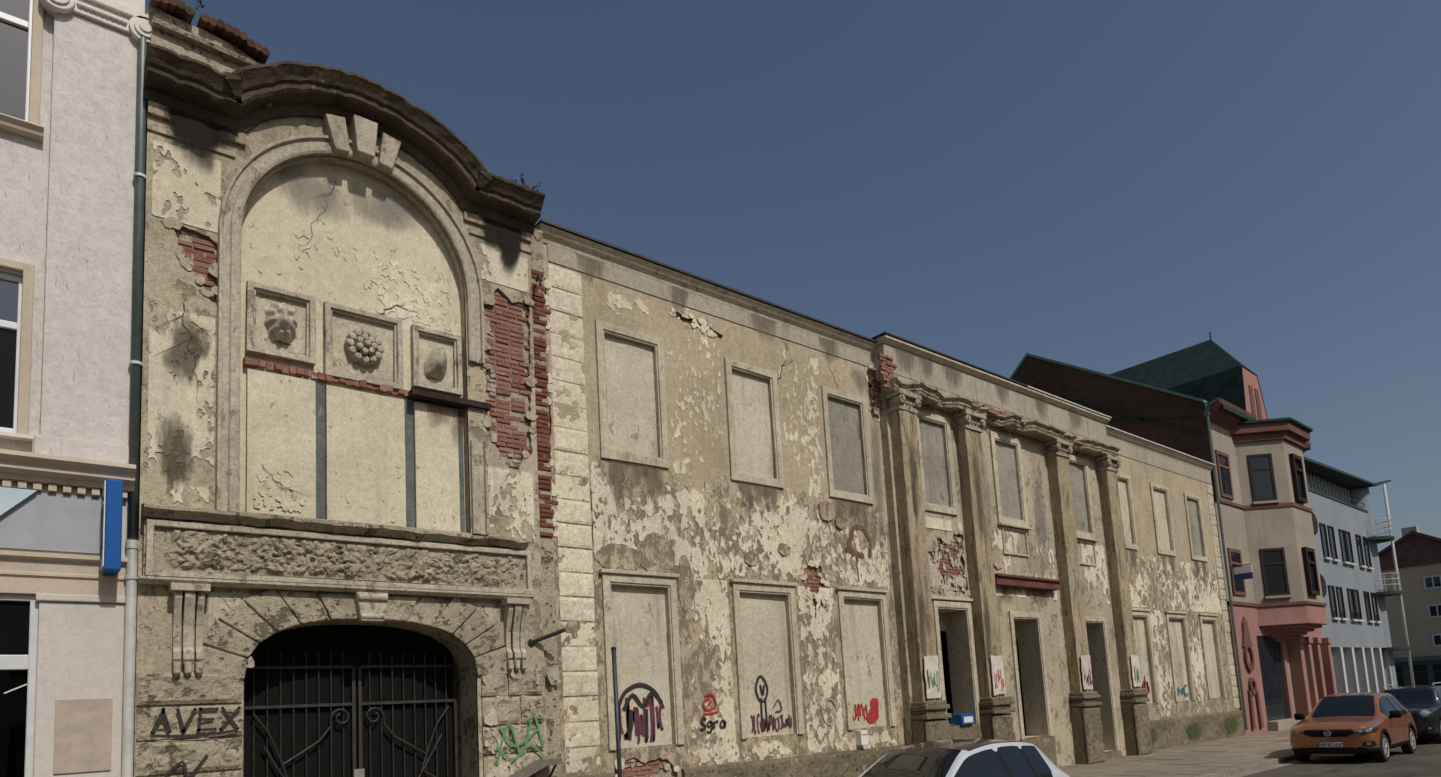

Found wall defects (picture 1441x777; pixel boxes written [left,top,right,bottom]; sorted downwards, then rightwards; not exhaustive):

flaking render [147,140,221,504]
flaking render [480,243,560,540]
peeling [607,290,649,316]
peeling [590,307,897,777]
peeling [1127,555,1221,717]